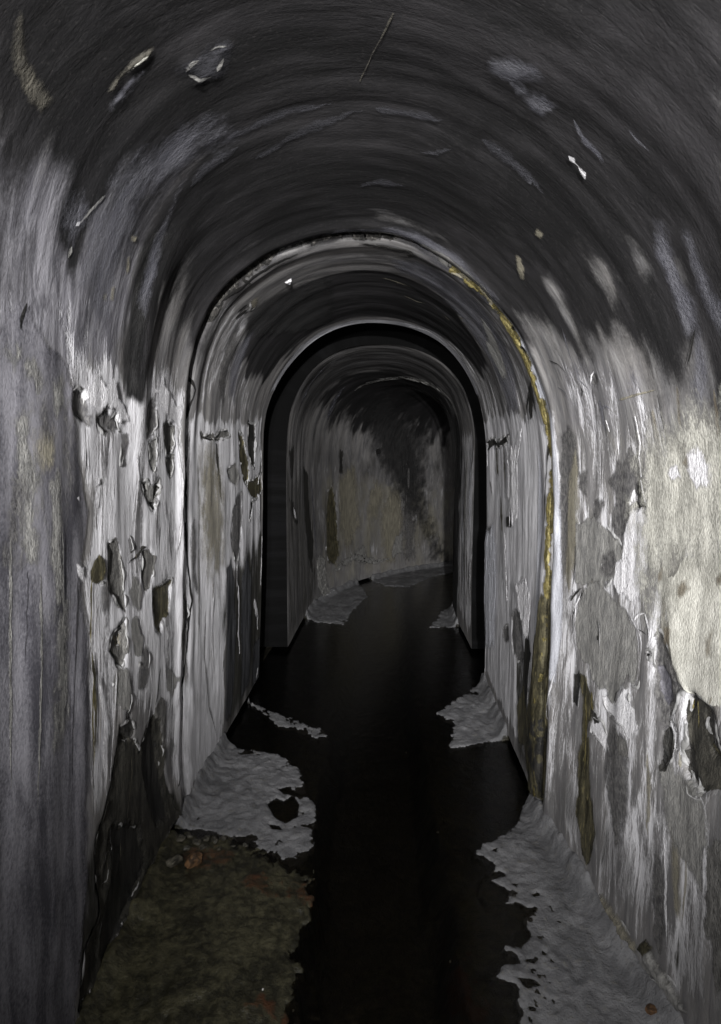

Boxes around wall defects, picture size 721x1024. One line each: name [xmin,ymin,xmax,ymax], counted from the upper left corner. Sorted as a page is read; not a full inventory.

water stain [70,132,197,317]
spalling [72,385,128,467]
spalling [141,396,175,527]
peeling [200,420,263,563]
water stain [279,231,648,751]
water stain [668,448,709,489]
water stain [0,221,262,1024]
peeling [575,404,721,891]
spalling [78,535,183,1018]